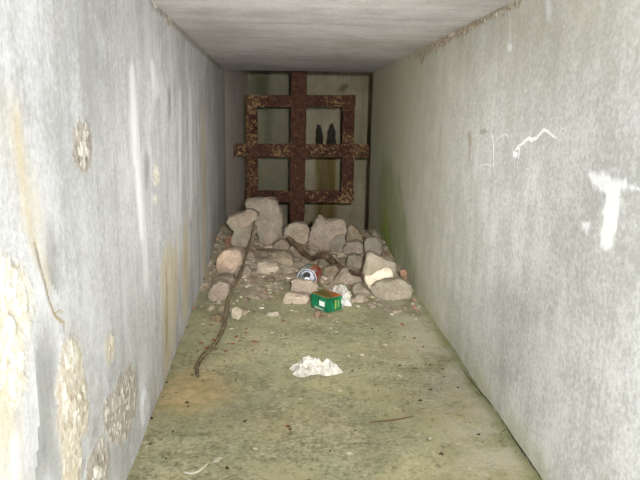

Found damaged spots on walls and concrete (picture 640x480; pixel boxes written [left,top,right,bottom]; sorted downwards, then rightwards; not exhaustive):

spalling [407,0,526,71]
spalling [68,109,96,183]
crack [479,125,568,184]
crack [33,240,65,331]
peeling [49,315,139,480]